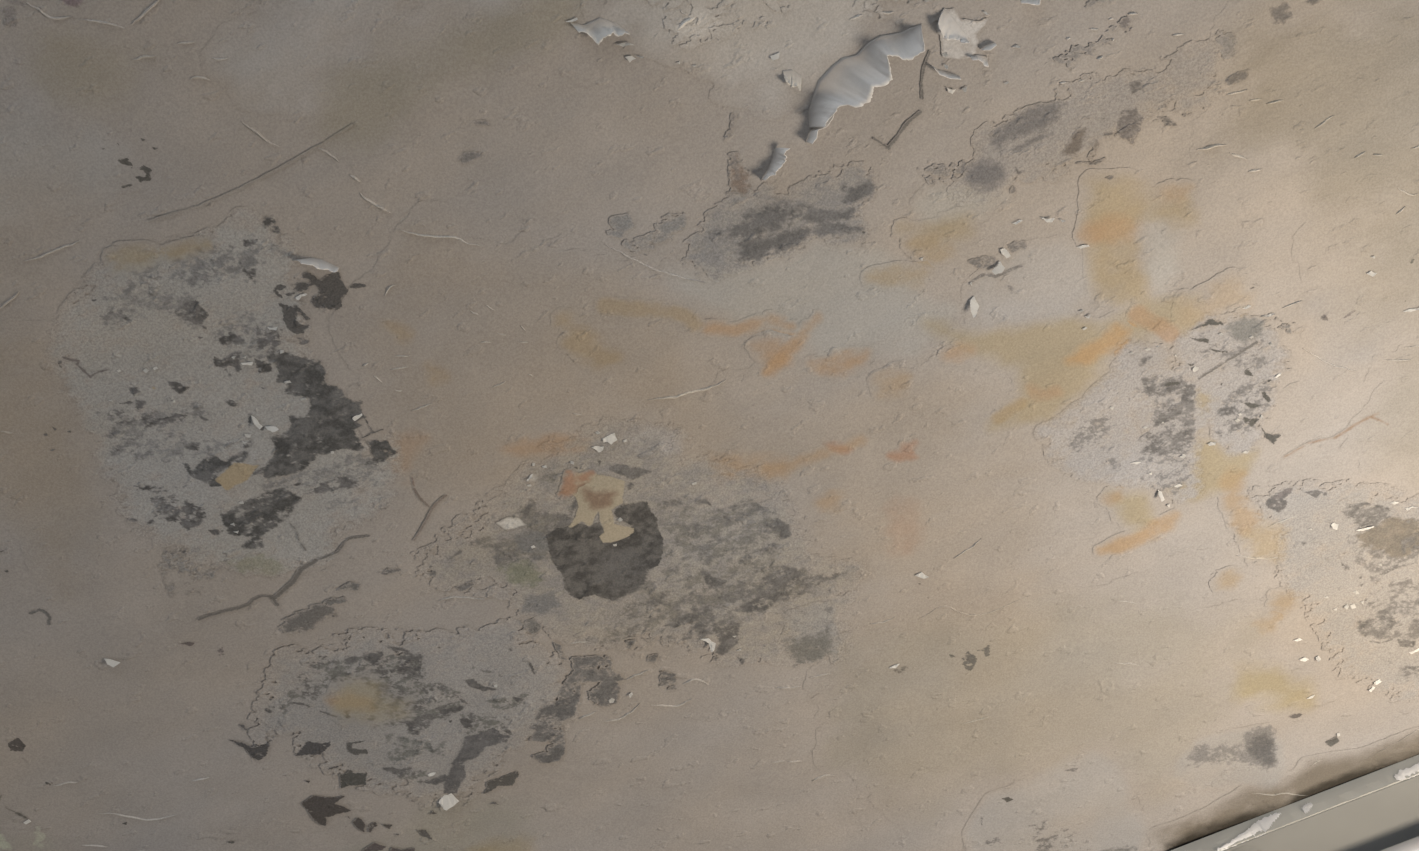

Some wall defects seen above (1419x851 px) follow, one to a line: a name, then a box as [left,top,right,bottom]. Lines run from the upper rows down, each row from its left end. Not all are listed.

peeling [566,18,643,62]
peeling [675,7,724,41]
peeling [770,8,997,144]
peeling [761,148,790,181]
peeling [42,206,407,598]
corrosion [1060,303,1179,370]
peeling [1033,305,1296,508]
peeling [230,416,870,851]
corrosion [1092,508,1184,558]
peeling [1245,478,1419,703]